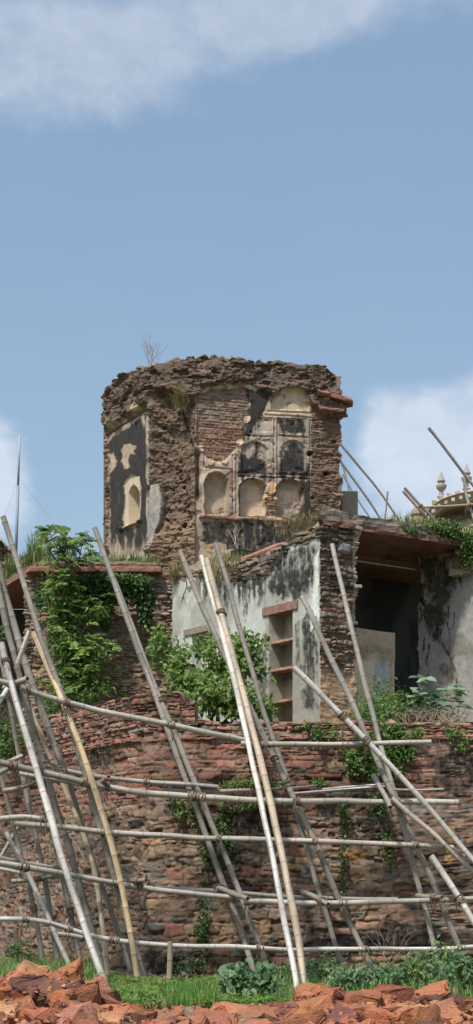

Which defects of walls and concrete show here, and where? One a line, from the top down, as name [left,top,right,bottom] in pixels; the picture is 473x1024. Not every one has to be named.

peeling [108,444,136,474]
spalling [128,385,251,593]
damp [202,388,317,614]
damp [419,555,462,642]
damp [295,613,318,708]